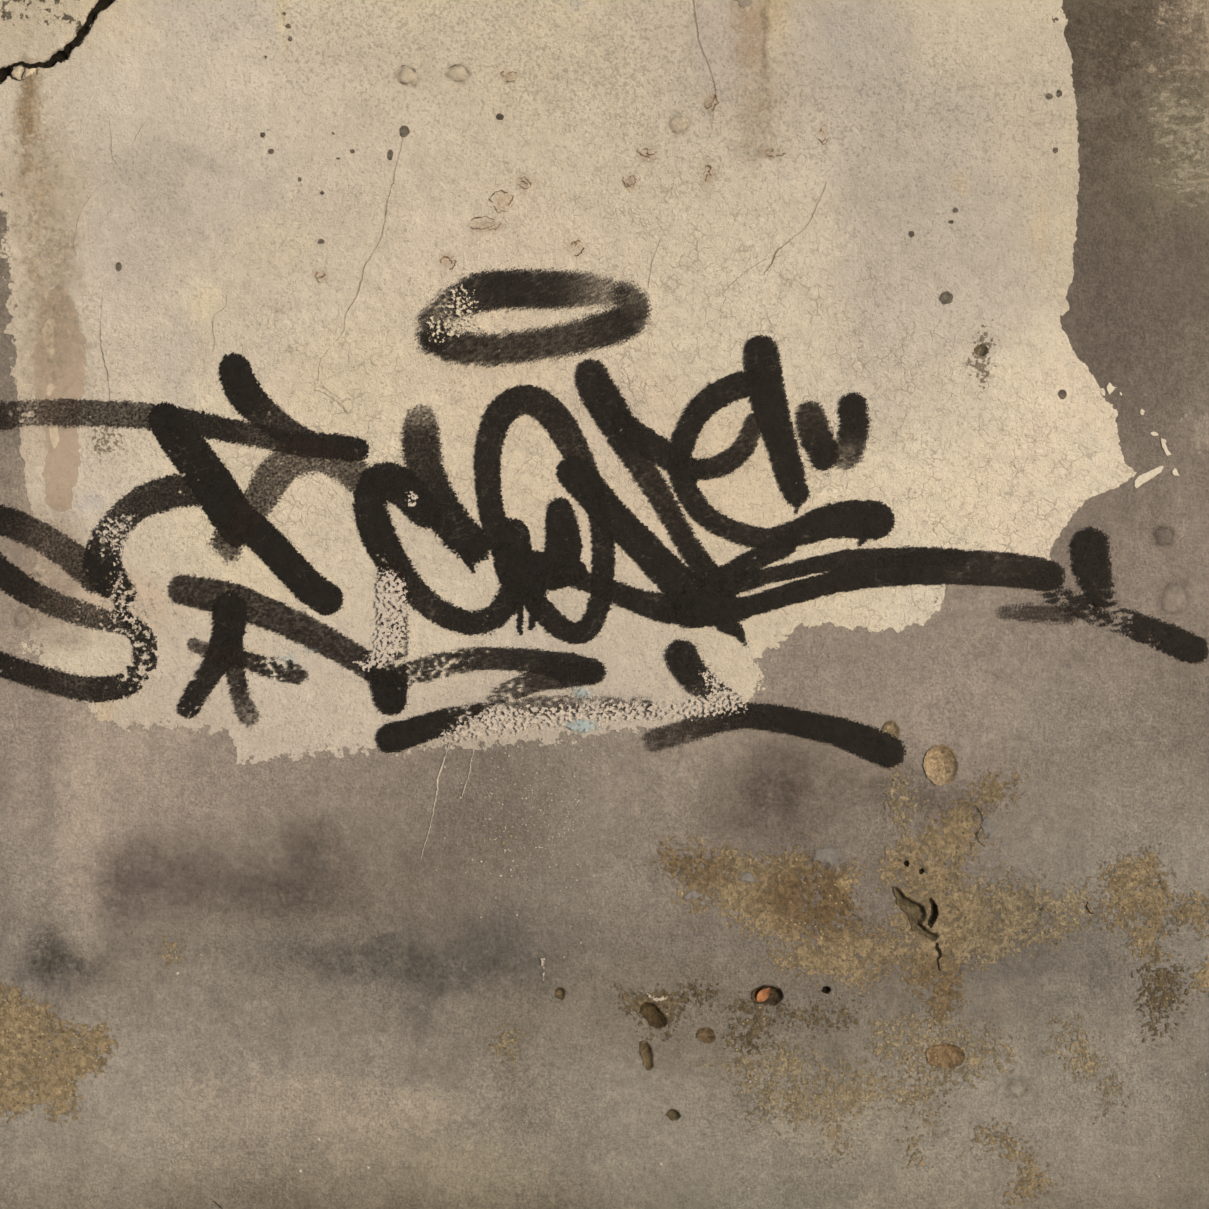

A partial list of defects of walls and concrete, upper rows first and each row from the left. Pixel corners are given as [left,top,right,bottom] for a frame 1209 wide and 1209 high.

crack [0,0,113,82]
leakage [15,72,51,240]
crack [73,122,145,254]
crack [314,140,403,411]
peeling [0,978,125,1130]
peeling [611,745,1209,1209]